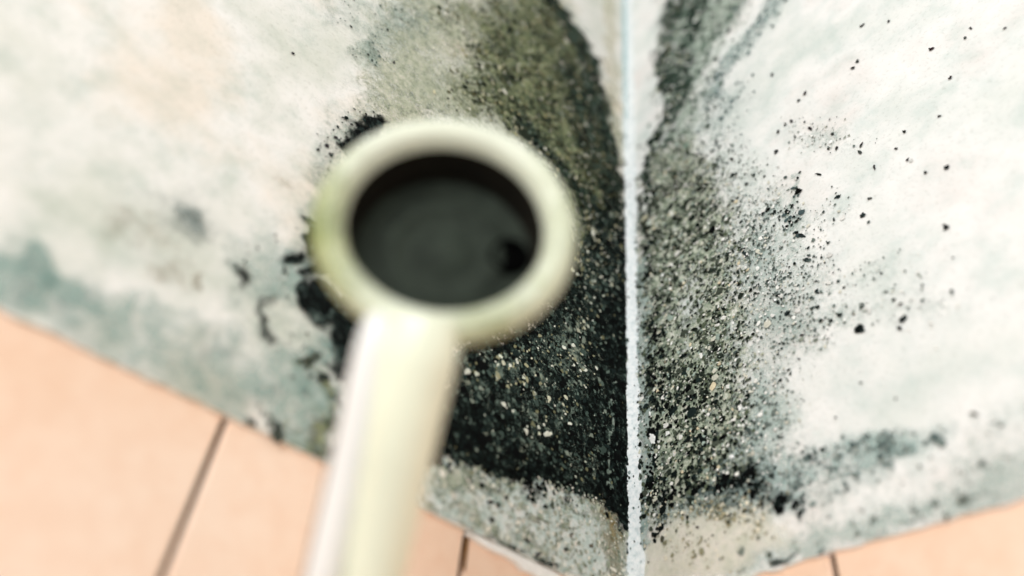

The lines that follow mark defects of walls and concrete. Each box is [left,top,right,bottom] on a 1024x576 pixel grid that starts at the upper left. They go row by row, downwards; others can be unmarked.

water stain [172,215,364,458]
water stain [312,0,1024,576]